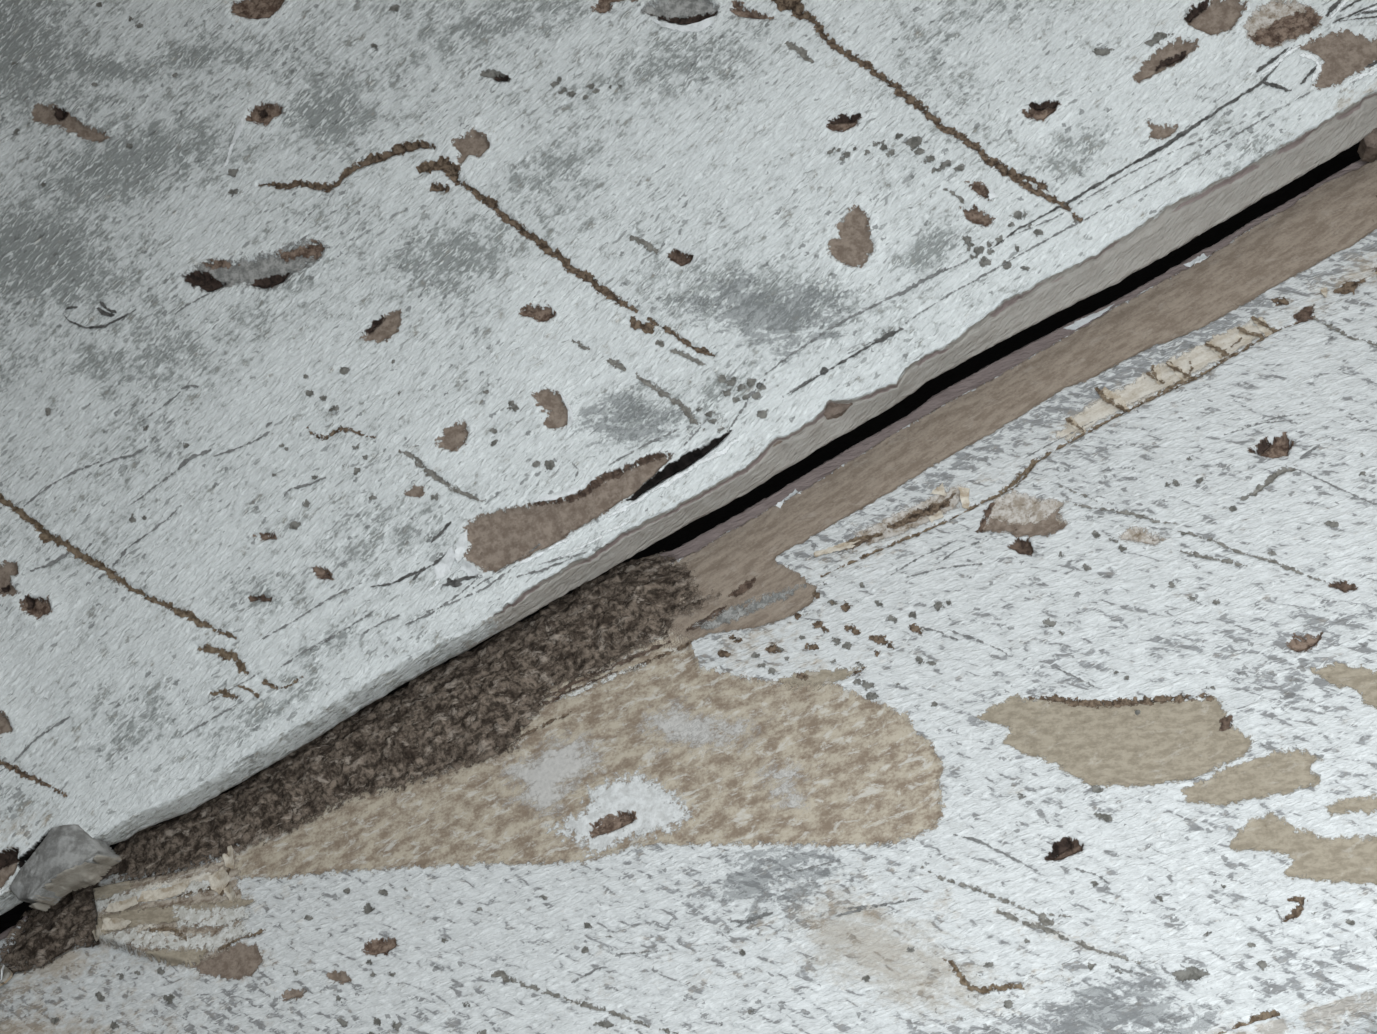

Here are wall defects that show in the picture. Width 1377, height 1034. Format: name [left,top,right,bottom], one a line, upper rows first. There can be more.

peeling [1133,0,1377,91]
spalling [223,101,284,197]
spalling [451,127,490,166]
crack [771,0,1083,222]
spalling [826,113,1043,271]
spalling [182,238,331,294]
crack [258,139,715,366]
crack [571,339,705,431]
crack [0,385,303,700]
crack [284,476,326,497]
crack [306,426,486,502]
peeling [208,159,1377,903]